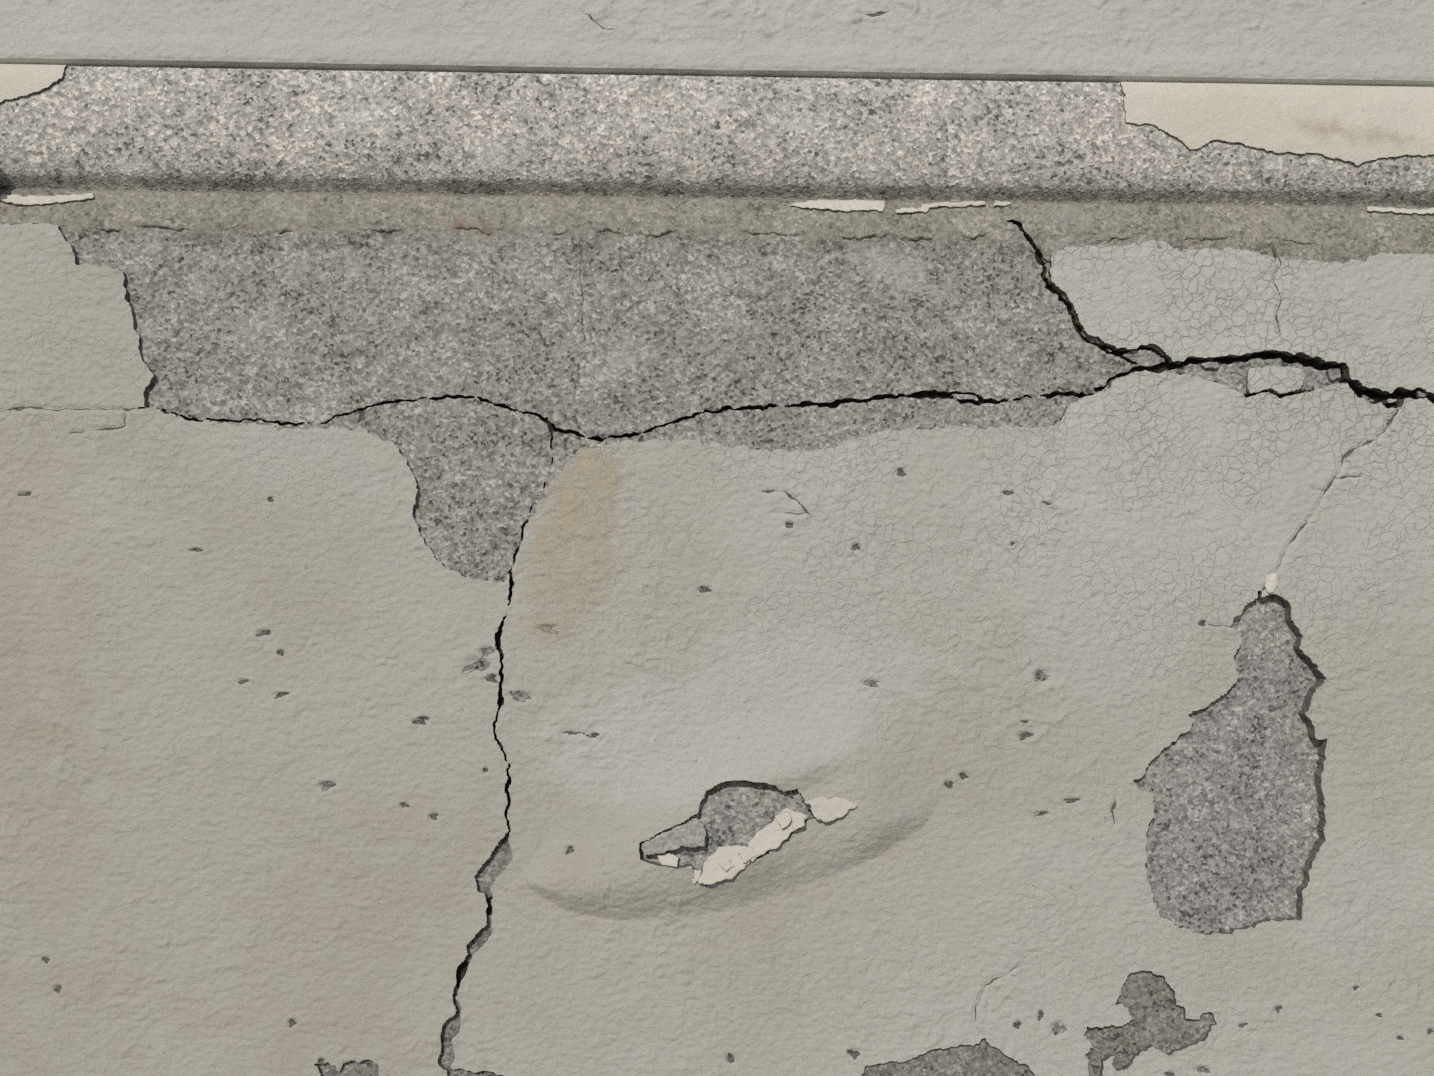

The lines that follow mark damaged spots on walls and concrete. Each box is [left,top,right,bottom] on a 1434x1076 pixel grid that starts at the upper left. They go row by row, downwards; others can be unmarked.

peeling [0,65,1434,215]
spalling [49,221,1434,583]
crack [4,219,1434,1073]
spalling [1133,573,1327,935]
spalling [314,1058,379,1076]
spalling [444,1060,503,1076]
spalling [847,1038,1035,1076]
spalling [1038,970,1217,1076]